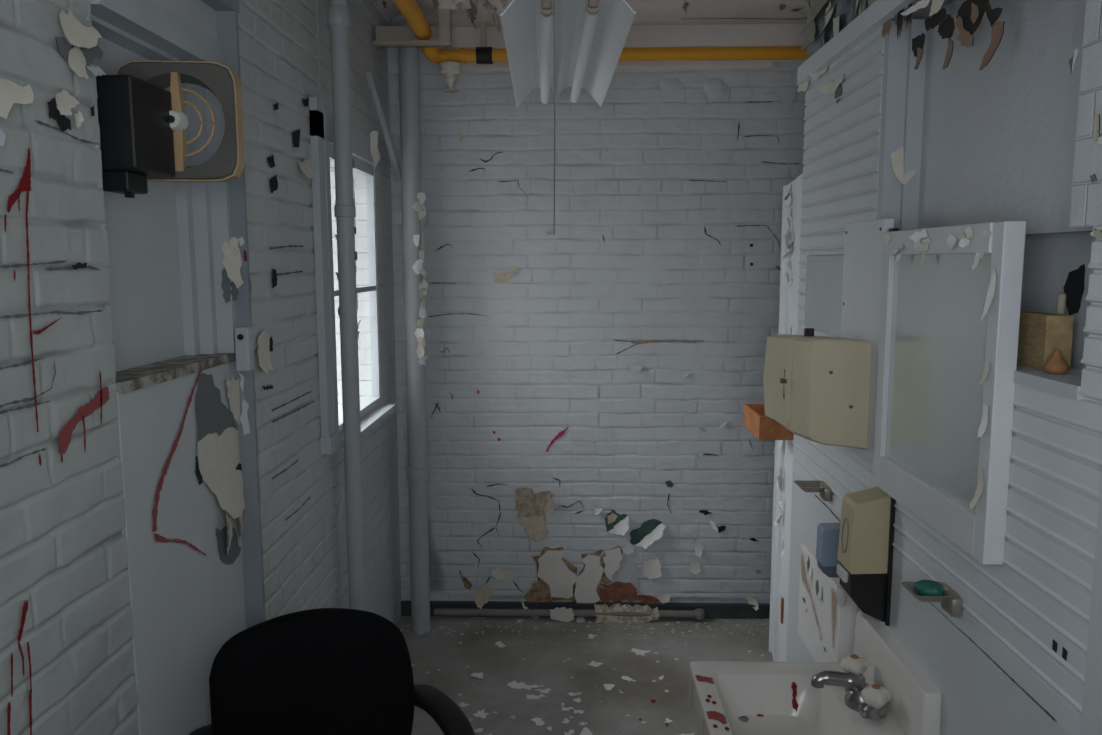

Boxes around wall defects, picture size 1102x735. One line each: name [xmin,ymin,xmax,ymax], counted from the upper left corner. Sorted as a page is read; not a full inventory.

peeling [55,8,106,79]
peeling [433,0,507,33]
peeling [779,0,876,51]
peeling [882,0,1005,70]
peeling [0,78,34,147]
peeling [47,90,95,131]
peeling [221,236,245,304]
peeling [412,192,429,365]
crack [615,340,697,355]
peeling [195,372,250,565]
crack [471,484,524,593]
spalling [516,488,670,623]